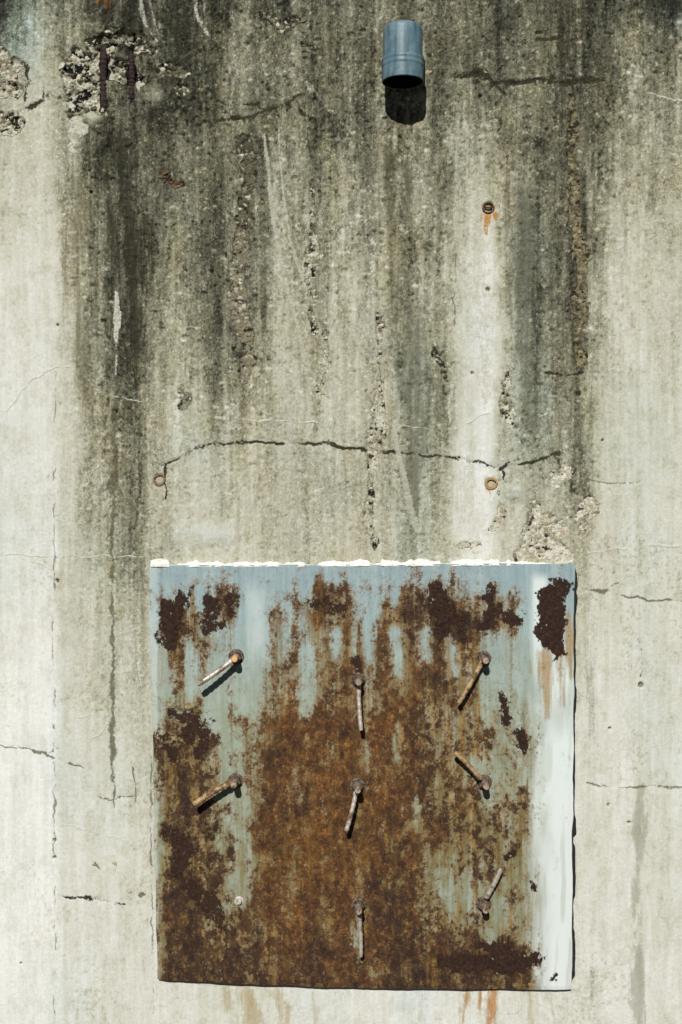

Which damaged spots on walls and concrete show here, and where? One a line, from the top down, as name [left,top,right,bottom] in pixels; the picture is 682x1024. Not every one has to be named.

leakage [114,0,209,54]
spalling [0,44,26,139]
spalling [58,26,193,122]
leakage [105,126,152,375]
leakage [262,134,354,444]
crack [161,440,579,499]
spalling [513,494,600,564]
corrosion [153,589,240,651]
corrosion [422,577,574,702]
crack [586,582,672,602]
corrosion [498,691,529,755]
crack [63,895,126,905]